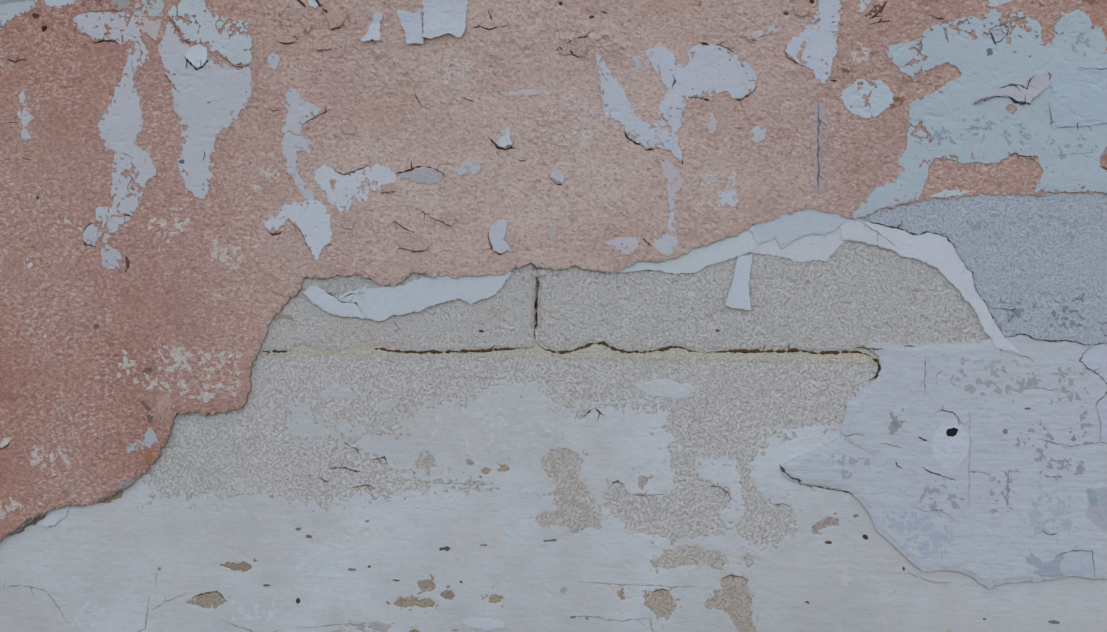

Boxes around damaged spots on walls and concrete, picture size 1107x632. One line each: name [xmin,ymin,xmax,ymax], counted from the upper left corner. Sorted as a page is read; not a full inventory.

peeling [0,0,253,269]
peeling [261,0,1107,589]
crack [374,280,1009,518]
peeling [127,427,158,453]
peeling [135,353,878,551]
peeling [8,506,70,536]
spalling [96,488,123,503]
peeling [186,591,231,609]
peeling [220,559,258,572]
peeling [386,574,463,614]
crack [568,581,695,632]
peeling [641,544,758,632]